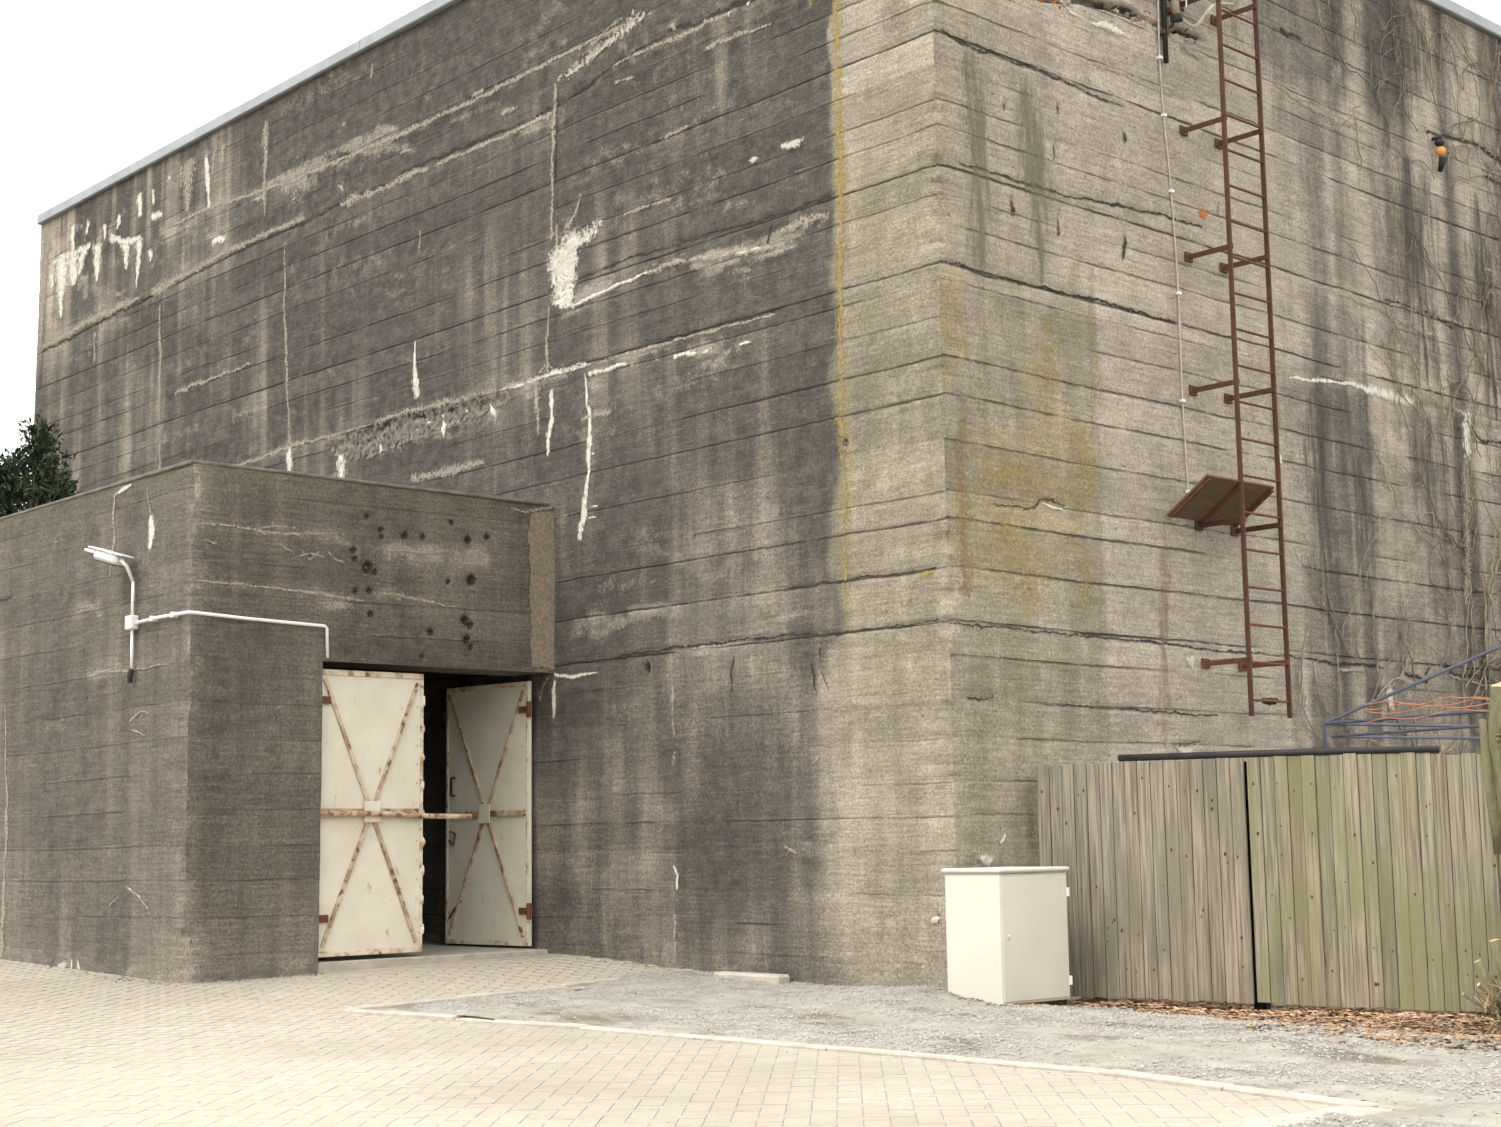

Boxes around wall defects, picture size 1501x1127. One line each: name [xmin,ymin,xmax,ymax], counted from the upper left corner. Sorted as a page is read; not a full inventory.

spalling [1043,0,1201,59]
efflorescence [168,143,226,212]
efflorescence [38,189,163,340]
spalling [351,547,377,593]
water stain [411,341,420,399]
spalling [461,616,474,649]
efflorescence [578,374,611,540]
water stain [830,0,849,619]
water stain [1304,402,1332,624]
water stain [1400,159,1438,385]
water stain [1460,194,1498,609]